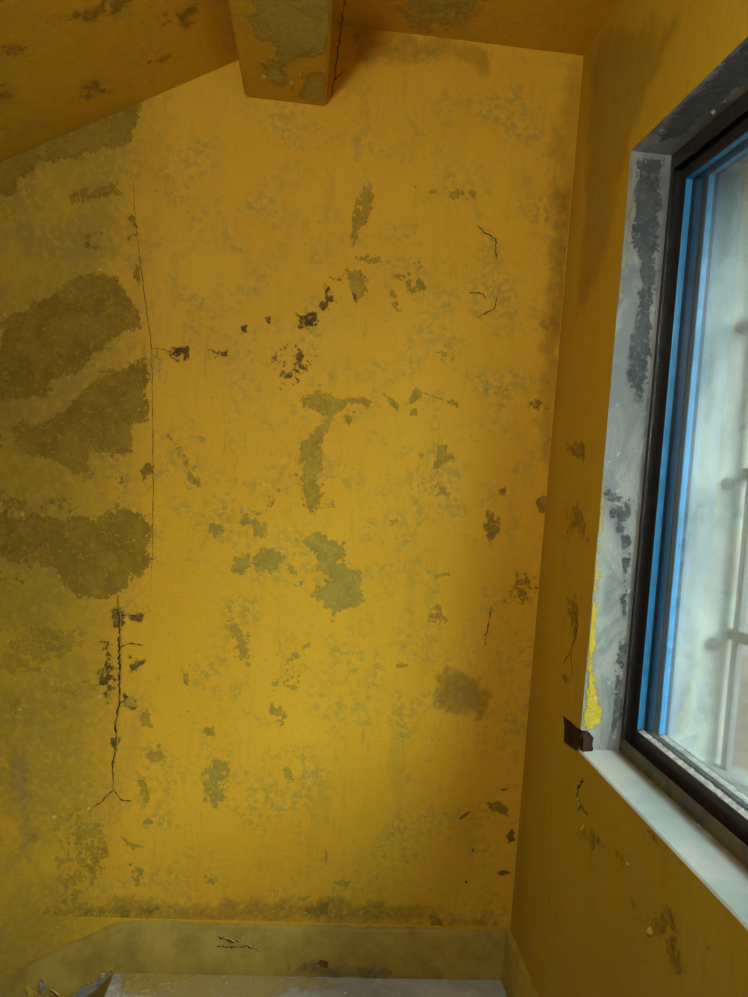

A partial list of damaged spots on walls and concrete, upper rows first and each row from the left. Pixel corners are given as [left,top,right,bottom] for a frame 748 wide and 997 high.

peeling [295,183,389,333]
peeling [395,261,426,300]
crack [93,166,172,807]
peeling [271,344,372,515]
peeling [383,388,459,416]
peeling [419,444,454,473]
peeling [231,488,303,586]
peeling [301,532,365,623]
spalling [72,969,114,997]